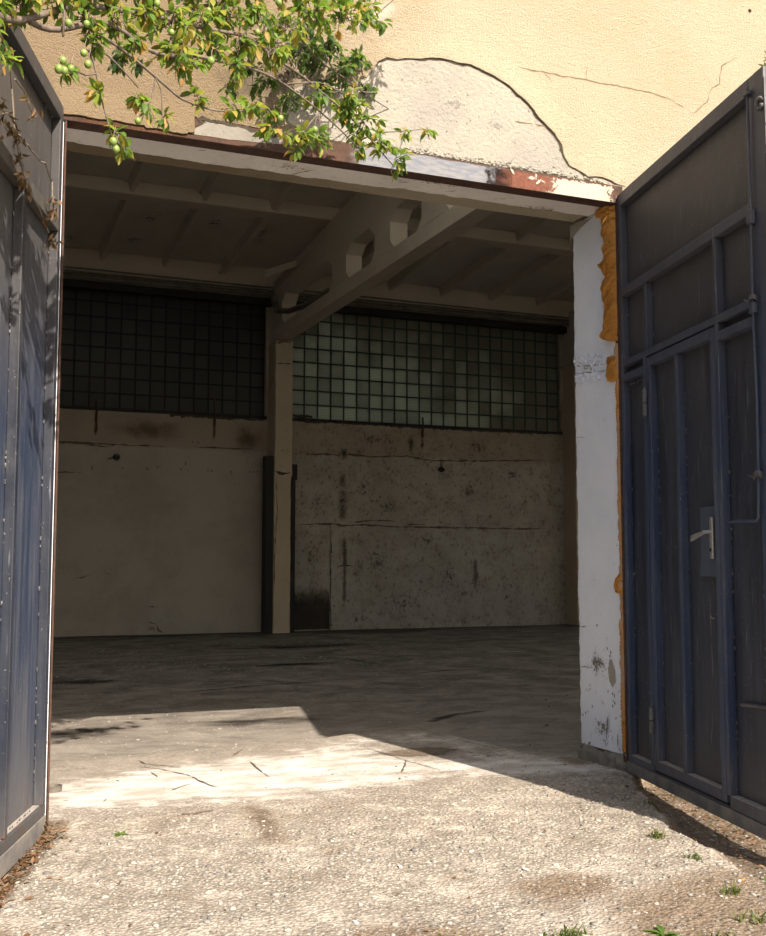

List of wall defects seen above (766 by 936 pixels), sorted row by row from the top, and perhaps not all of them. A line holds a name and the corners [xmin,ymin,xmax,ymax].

flaking render [283,60,624,188]
rust [485,168,570,193]
crack [367,40,739,187]
spalling [582,581,626,754]
crack [139,760,220,790]